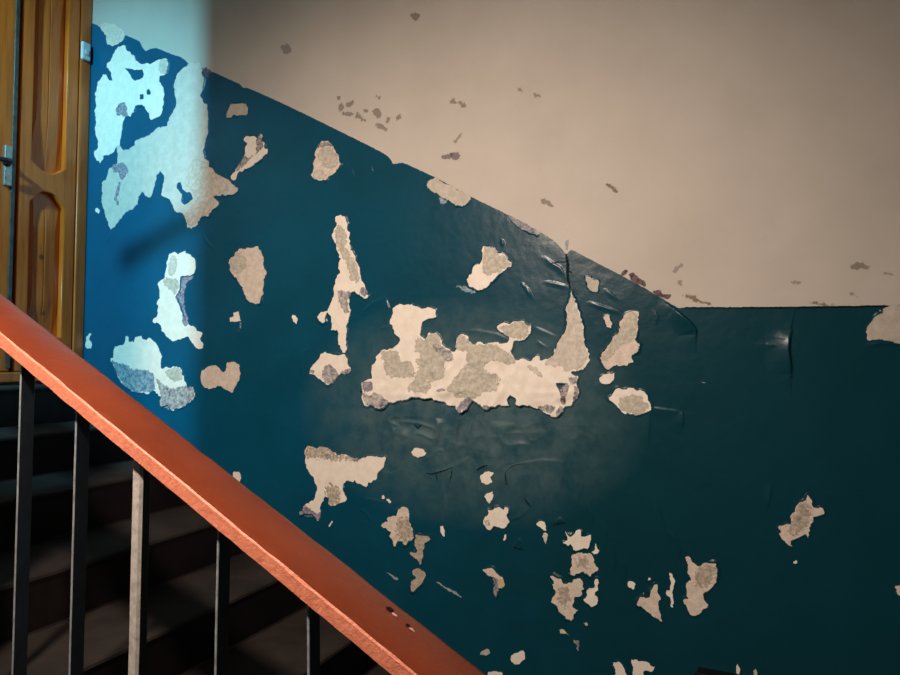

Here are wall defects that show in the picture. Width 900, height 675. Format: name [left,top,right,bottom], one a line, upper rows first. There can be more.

peeling [93,22,269,230]
peeling [110,249,242,412]
peeling [228,245,267,306]
peeling [309,213,370,388]
peeling [456,245,514,293]
peeling [359,289,654,418]
crack [550,254,573,289]
peeling [864,305,900,347]
peeling [298,445,388,528]
peeling [775,492,827,547]
peeling [549,528,601,653]
peeling [626,555,721,623]